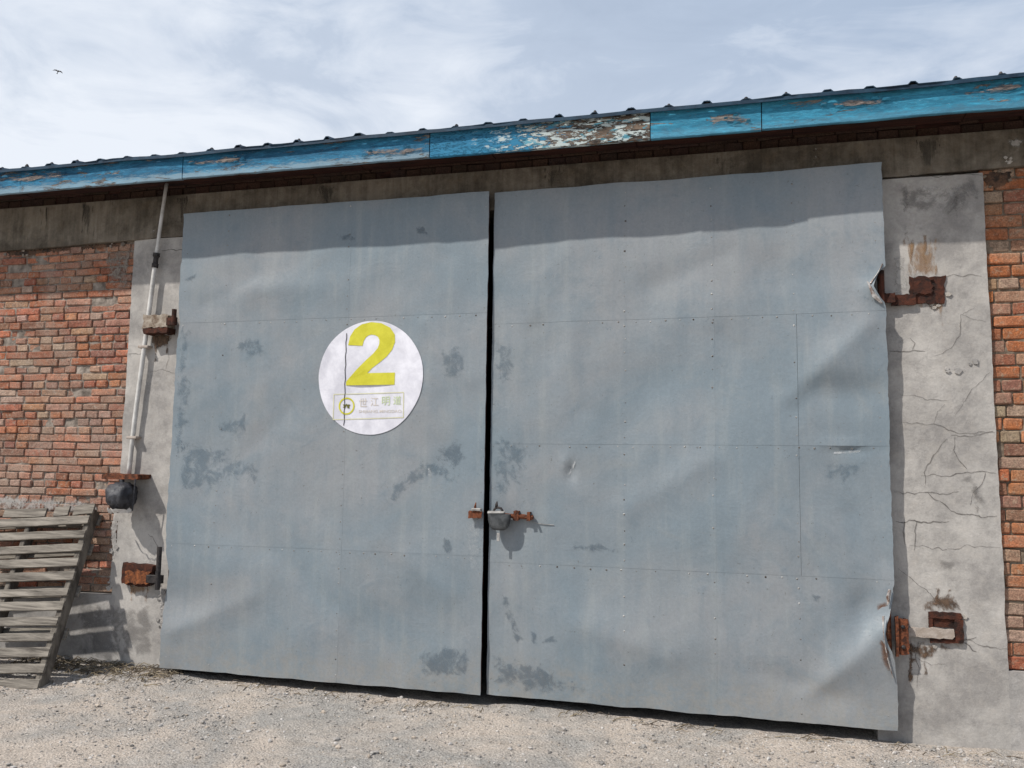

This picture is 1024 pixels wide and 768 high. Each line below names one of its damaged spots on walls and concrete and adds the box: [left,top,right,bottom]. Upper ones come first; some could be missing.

corrosion [909,236,936,274]
crack [896,432,995,550]